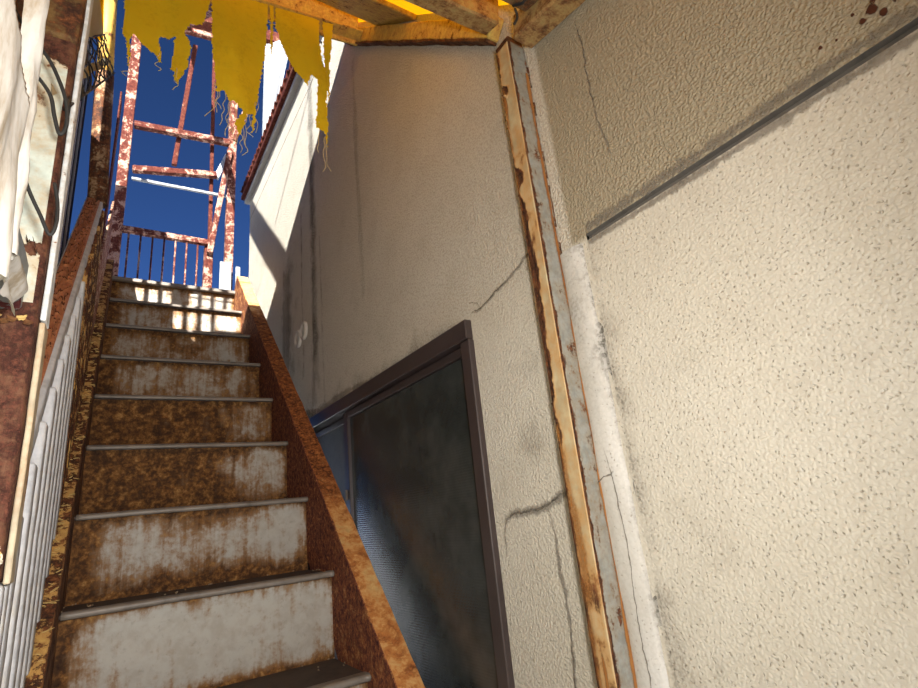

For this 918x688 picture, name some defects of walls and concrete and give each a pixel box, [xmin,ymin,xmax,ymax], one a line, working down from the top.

peeling [0,314,34,325]
corrosion [525,73,577,350]
crack [510,496,558,516]
corrosion [578,361,638,688]